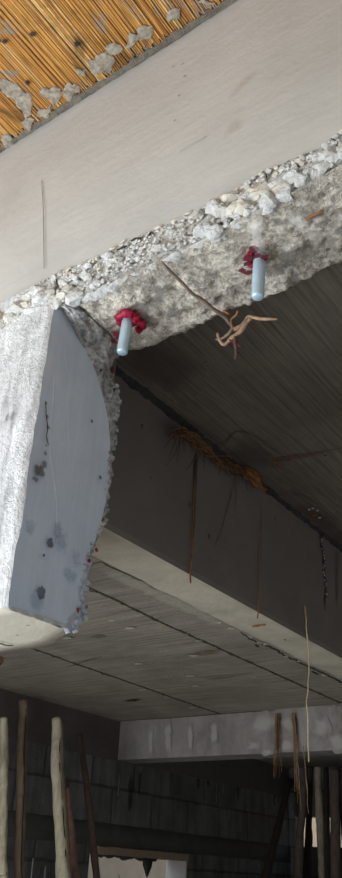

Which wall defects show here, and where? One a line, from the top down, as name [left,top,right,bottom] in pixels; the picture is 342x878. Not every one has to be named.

spalling [0,129,342,634]
crack [0,643,275,721]
crack [87,586,342,706]